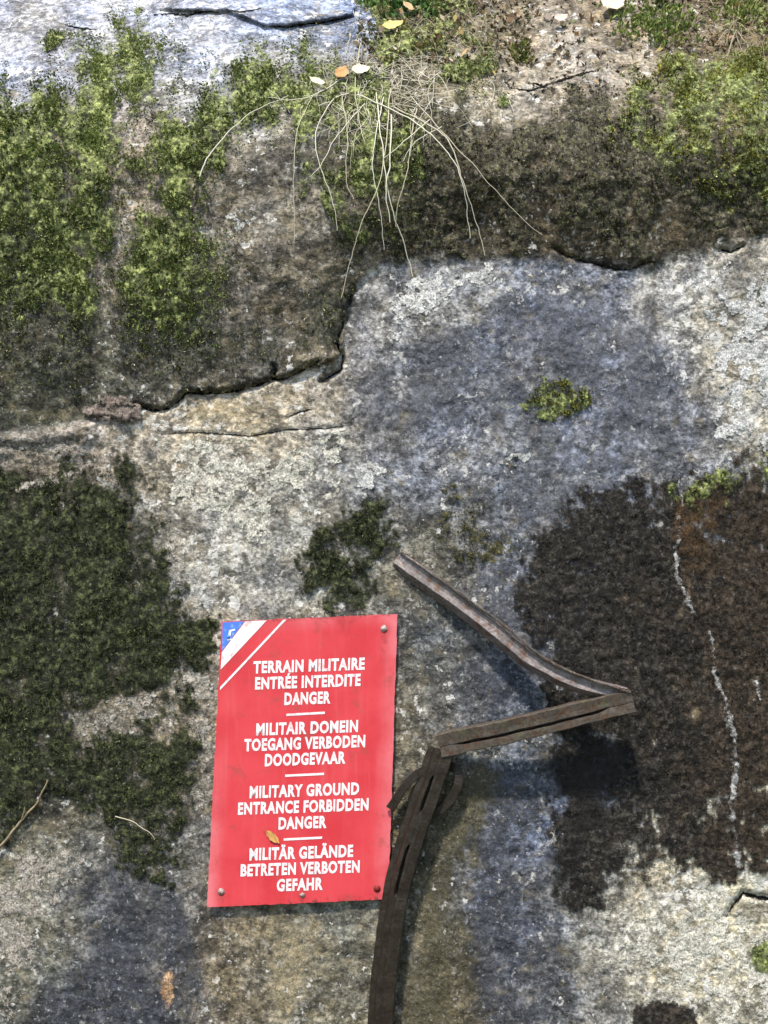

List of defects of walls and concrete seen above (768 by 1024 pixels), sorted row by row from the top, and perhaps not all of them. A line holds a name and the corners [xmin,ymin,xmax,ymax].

crack [141,292,353,437]